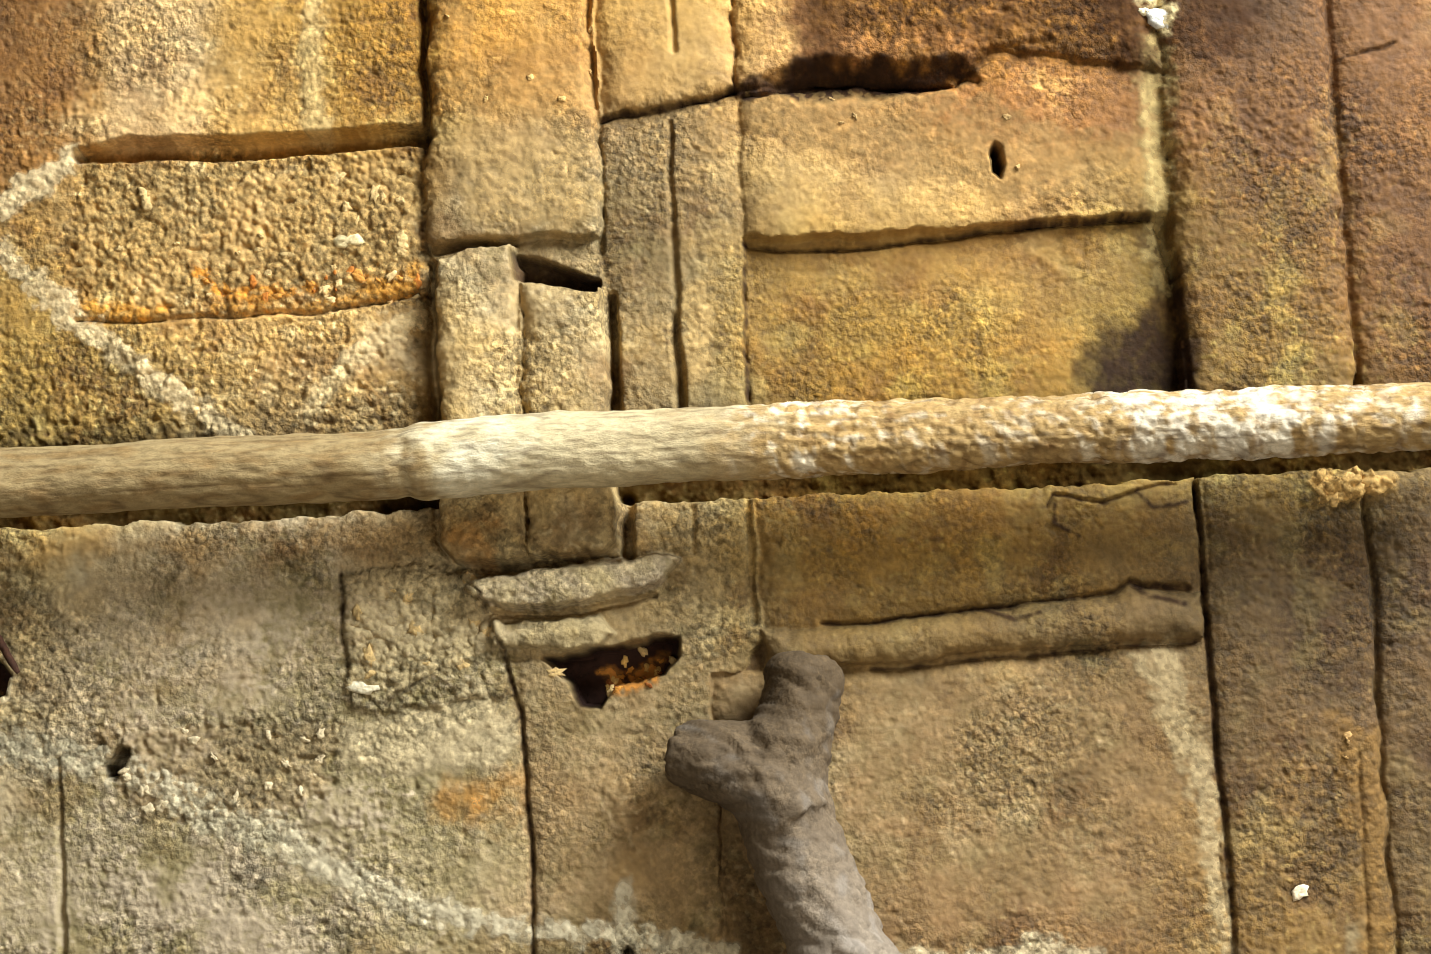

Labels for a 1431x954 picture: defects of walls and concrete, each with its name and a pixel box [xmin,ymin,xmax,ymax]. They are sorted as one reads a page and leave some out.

damp [729,53,971,102]
damp [1138,0,1178,295]
rust [69,298,169,323]
rust [185,261,422,315]
peeling [546,667,567,677]
peeling [605,646,677,697]